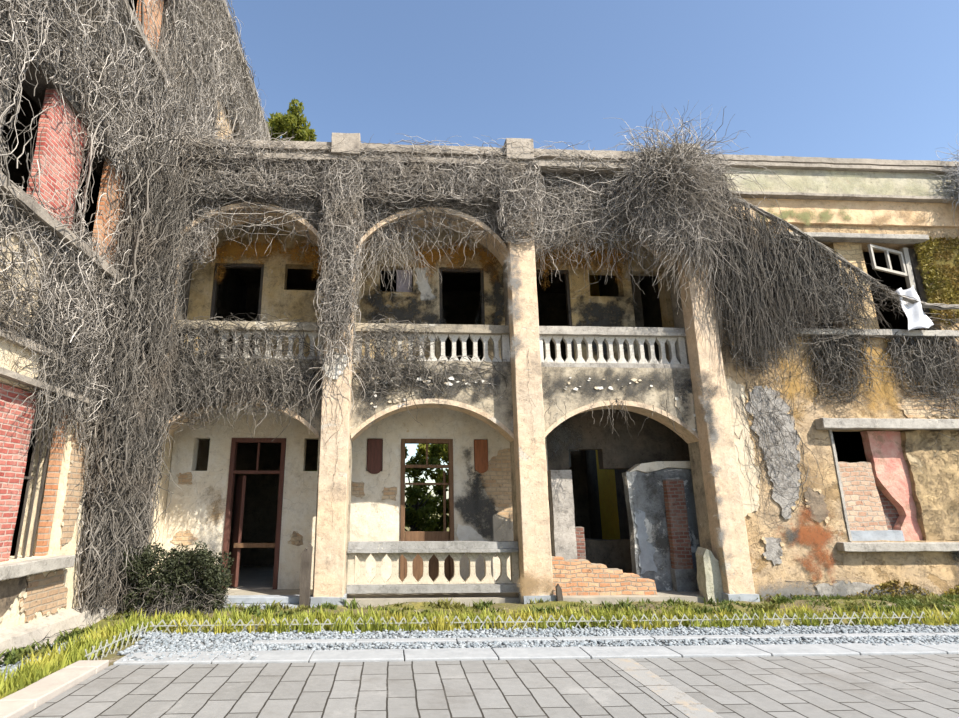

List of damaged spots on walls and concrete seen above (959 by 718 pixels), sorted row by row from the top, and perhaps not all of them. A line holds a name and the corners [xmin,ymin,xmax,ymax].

water stain [357,284,443,324]
water stain [415,230,522,325]
water stain [569,292,638,327]
water stain [353,366,507,424]
water stain [542,340,719,448]
peeling [60,421,89,550]
flaking render [351,481,365,499]
water stain [454,450,514,541]
flaking render [479,448,513,521]
flaking render [725,376,830,524]
corrosion [785,509,833,580]
peeling [0,569,68,623]